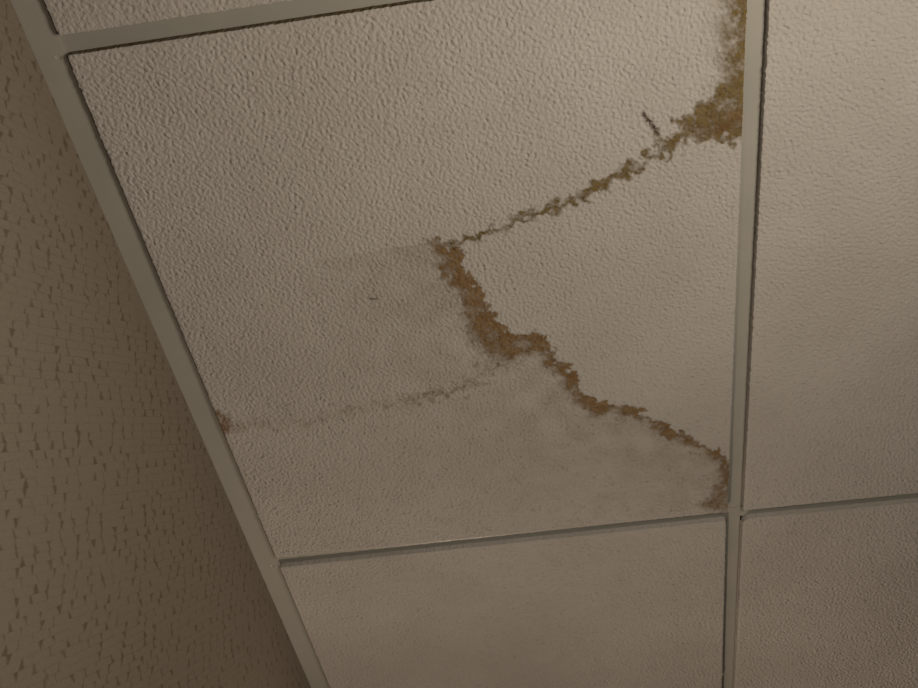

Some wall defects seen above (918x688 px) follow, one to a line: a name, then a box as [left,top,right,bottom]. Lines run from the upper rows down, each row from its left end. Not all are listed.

leakage [435,0,747,509]